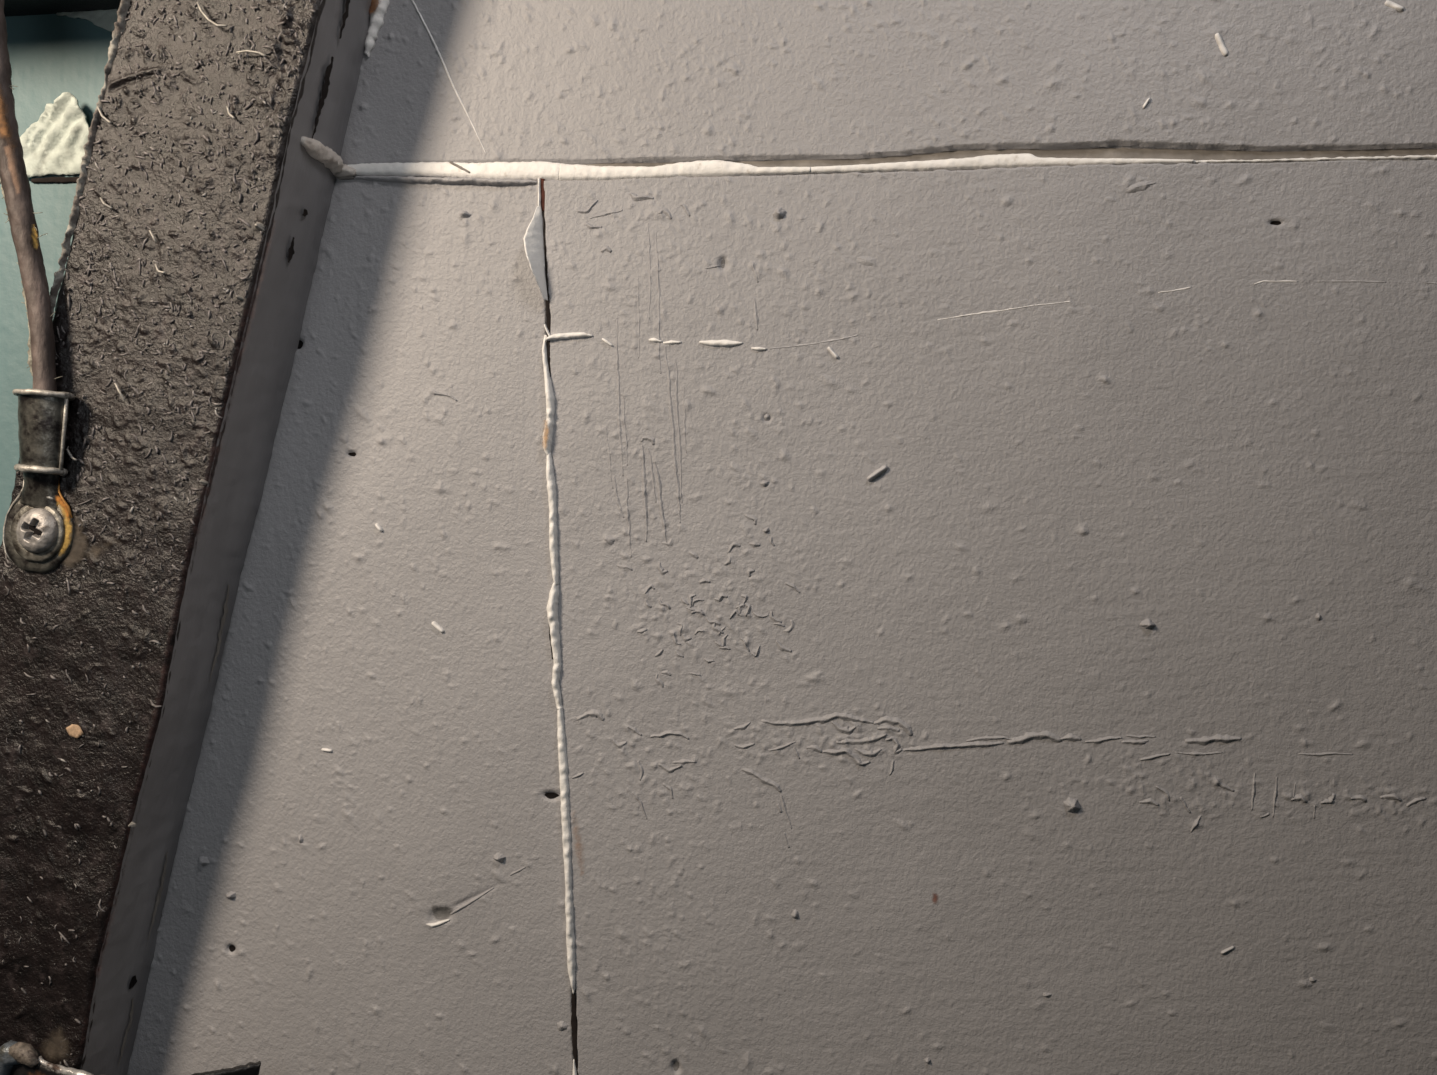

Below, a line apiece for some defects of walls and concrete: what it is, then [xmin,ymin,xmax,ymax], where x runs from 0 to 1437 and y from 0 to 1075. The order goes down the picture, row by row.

peeling [56,9,118,32]
peeling [20,92,89,179]
crack [300,136,1437,1075]